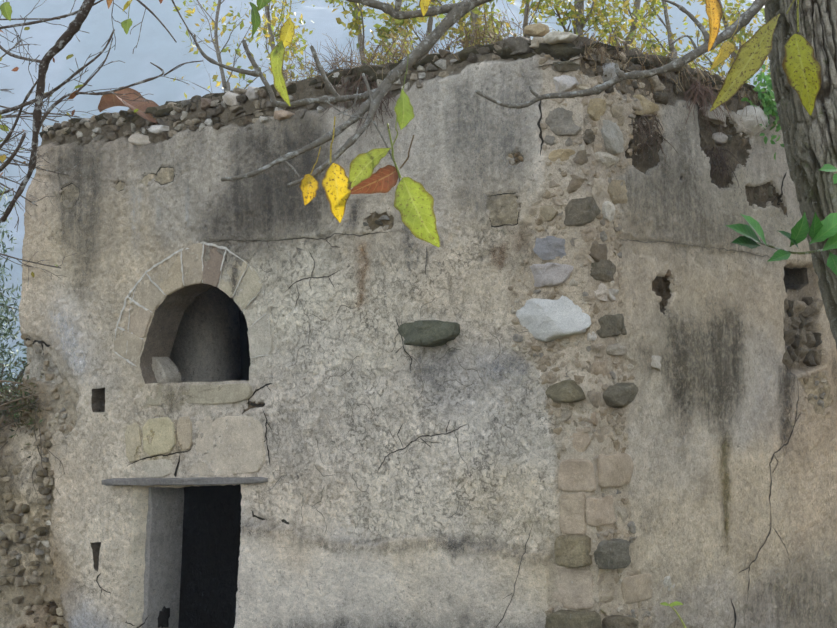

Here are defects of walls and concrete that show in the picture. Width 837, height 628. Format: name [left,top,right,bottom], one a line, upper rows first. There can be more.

damp [204,131,330,234]
crack [536,100,544,156]
spalling [698,109,752,188]
spalling [745,182,787,215]
crack [206,231,392,367]
spalling [652,269,677,314]
damp [665,310,743,447]
spalling [15,335,79,628]
crack [241,383,288,490]
crack [252,436,331,536]
crack [378,420,468,474]
crack [731,369,801,628]